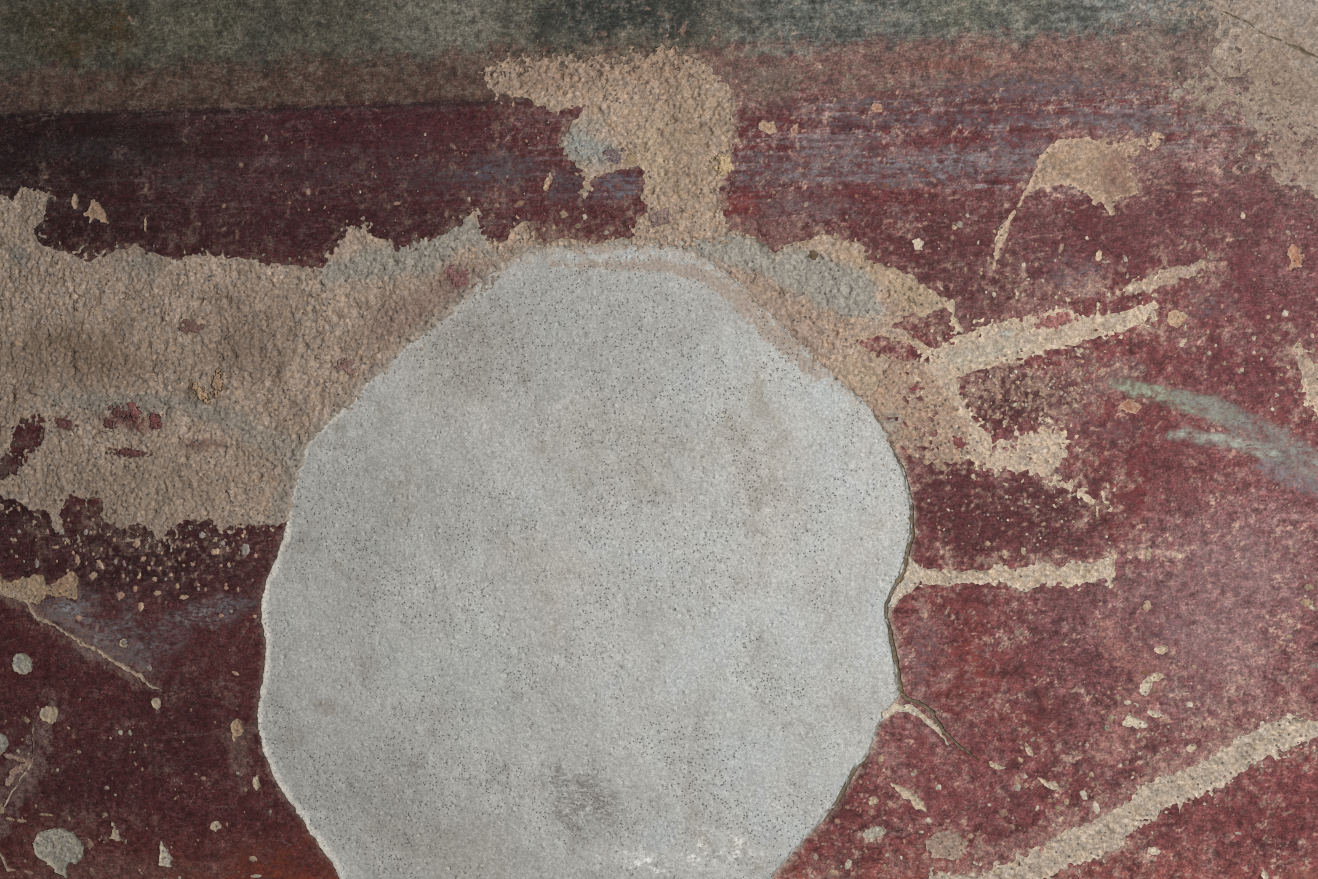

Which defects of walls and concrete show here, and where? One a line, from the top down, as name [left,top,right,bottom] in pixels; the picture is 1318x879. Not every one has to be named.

crack [1223,11,1318,58]
spalling [0,0,1318,610]
crack [881,444,979,760]
spalling [1154,645,1169,655]
spalling [795,664,1318,879]
spalling [0,803,127,878]
spalling [158,841,181,879]